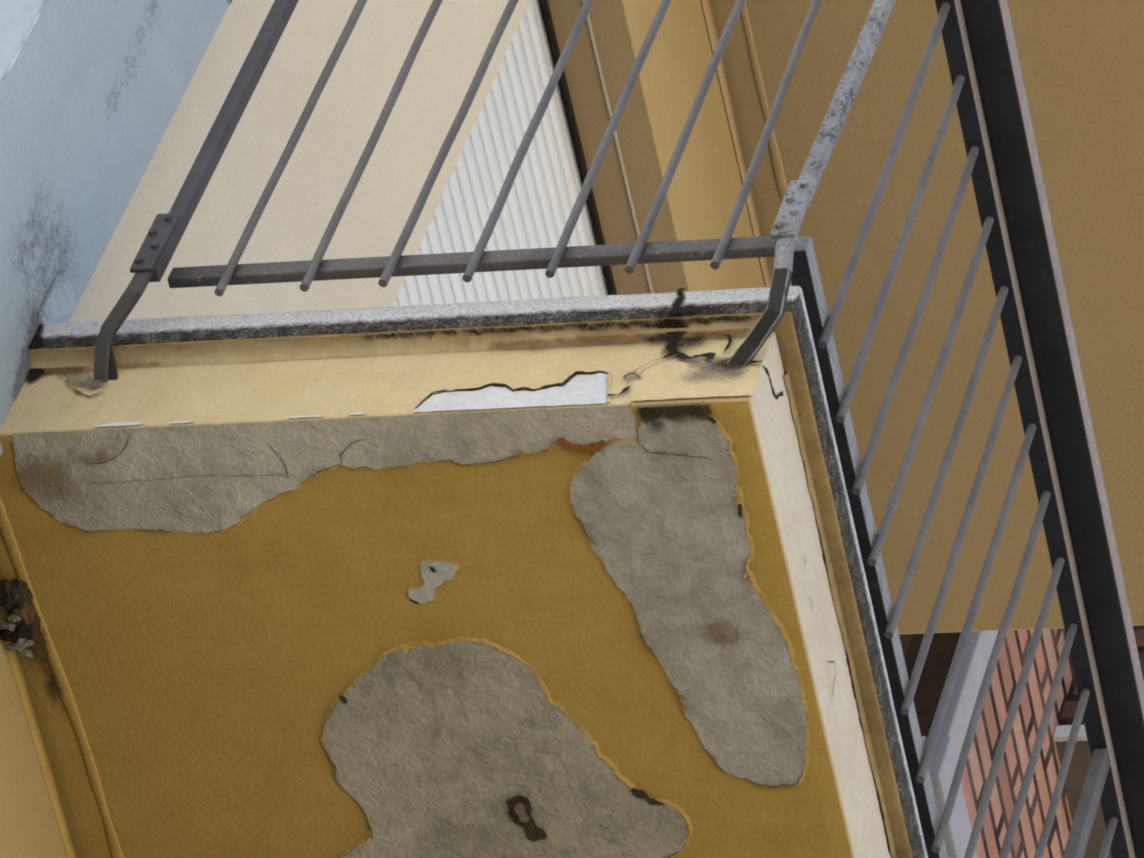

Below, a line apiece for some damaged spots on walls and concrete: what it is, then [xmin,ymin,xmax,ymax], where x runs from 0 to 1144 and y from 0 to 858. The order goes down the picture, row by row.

water stain [13,200,74,400]
water stain [365,288,757,355]
spalling [0,579,58,699]
peeling [9,371,811,789]
peeling [318,636,693,858]